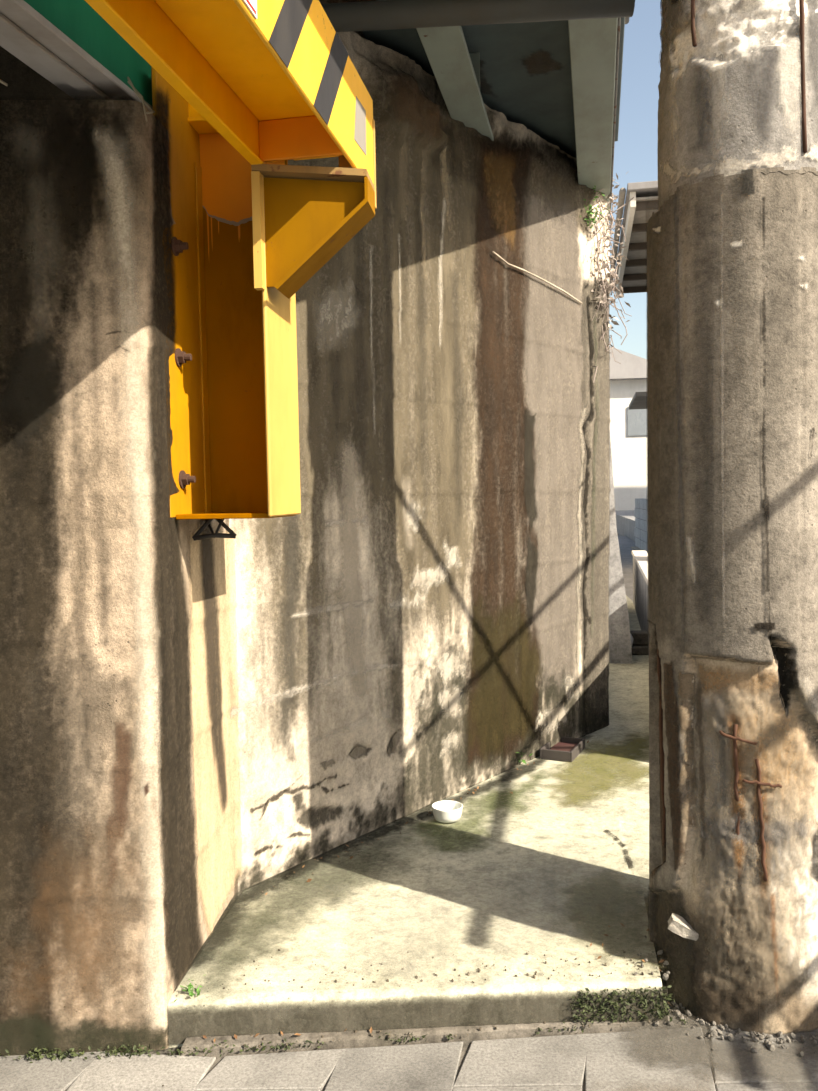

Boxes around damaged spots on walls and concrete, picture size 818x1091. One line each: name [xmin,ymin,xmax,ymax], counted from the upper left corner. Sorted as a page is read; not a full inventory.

spalling [660,0,818,184]
crack [759,197,767,267]
water stain [0,68,668,1056]
crack [576,296,599,735]
crack [761,294,772,636]
crack [255,832,310,856]
crack [251,775,348,816]
spalling [648,621,818,1034]